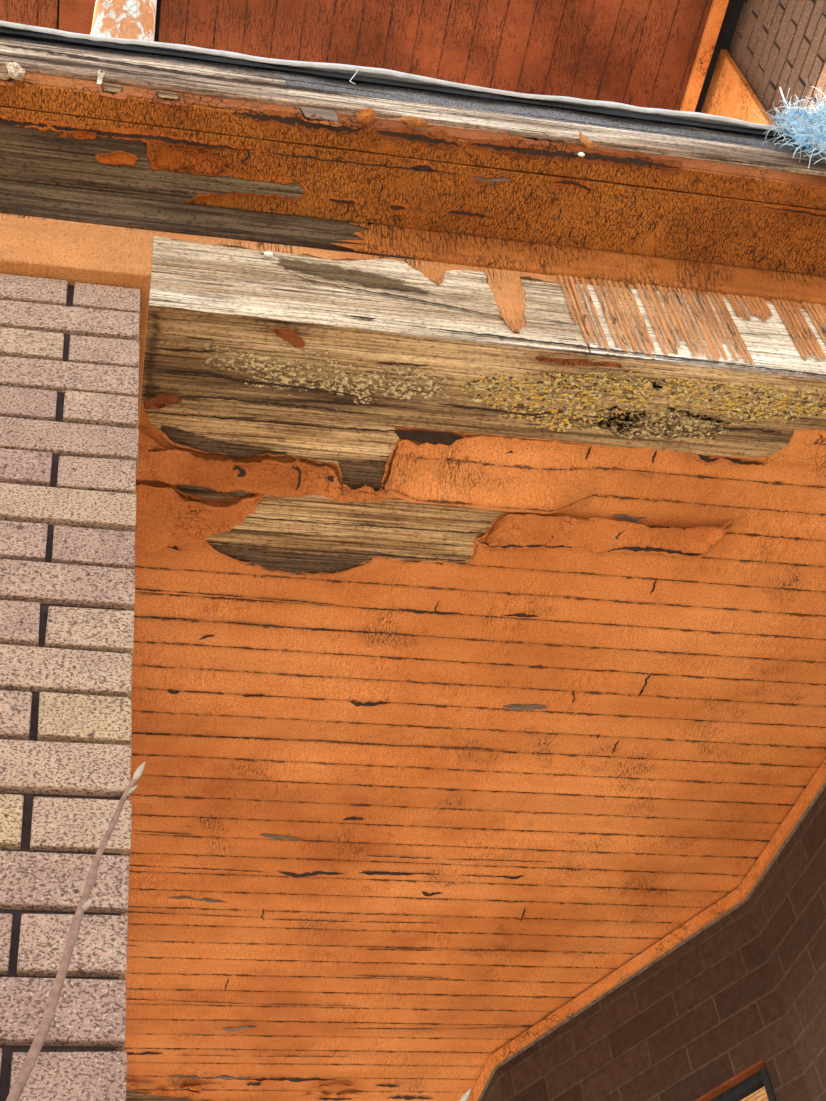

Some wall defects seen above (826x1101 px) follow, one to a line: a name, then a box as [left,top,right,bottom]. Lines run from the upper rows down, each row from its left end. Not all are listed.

peeling [0,62,25,86]
peeling [96,70,128,99]
peeling [152,91,186,106]
peeling [296,106,342,127]
peeling [356,107,377,125]
peeling [399,116,429,128]
peeling [500,131,599,150]
peeling [0,121,309,203]
peeling [169,237,826,377]
peeling [135,394,726,576]
peeling [126,1072,369,1101]
peeling [376,1085,433,1100]